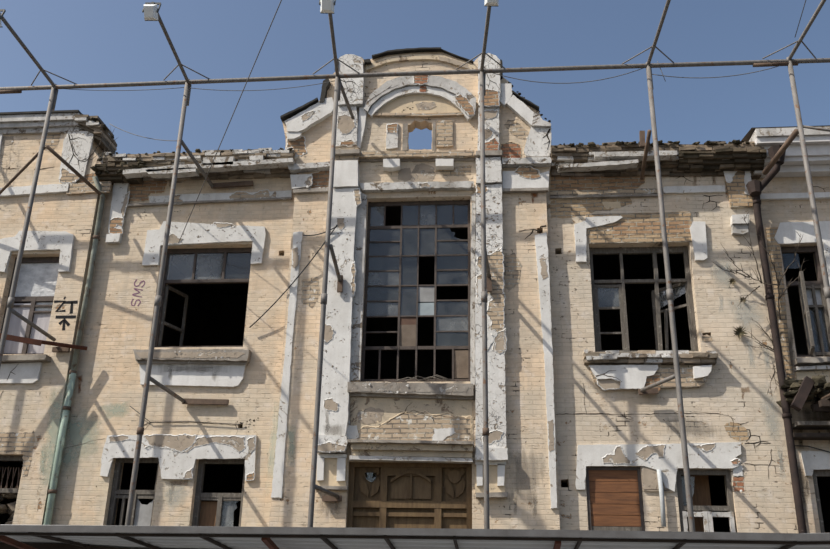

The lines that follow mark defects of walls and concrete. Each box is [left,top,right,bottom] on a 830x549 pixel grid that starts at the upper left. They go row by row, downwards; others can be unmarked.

spalling [337,108,359,147]
spalling [468,110,500,150]
spalling [334,209,351,241]
peeling [489,324,507,368]
peeling [596,379,620,391]
spalling [644,375,660,391]
crack [556,370,782,478]
peeling [108,414,262,479]
peeling [318,441,347,453]
peeling [602,444,666,465]
peeling [689,443,716,453]